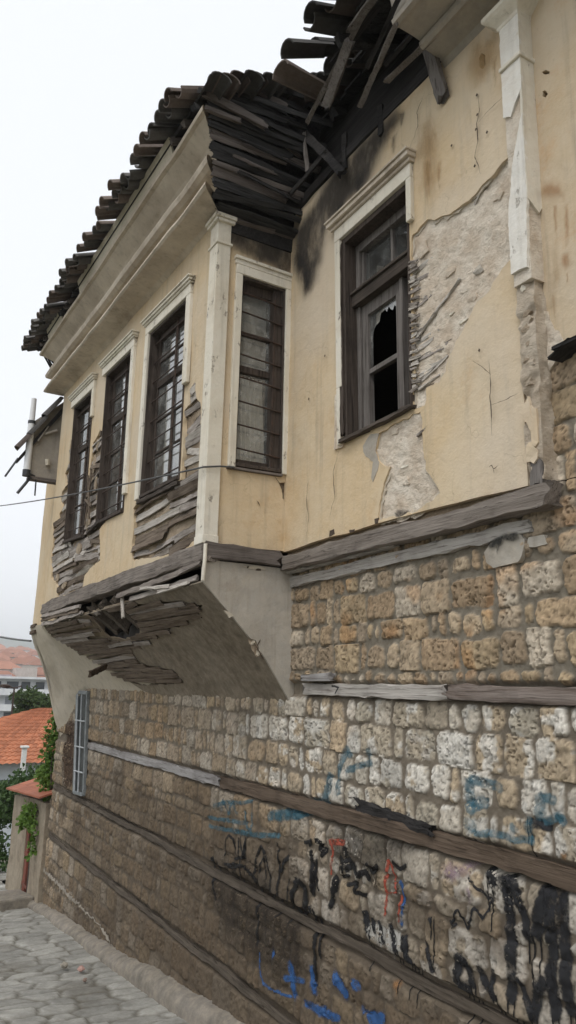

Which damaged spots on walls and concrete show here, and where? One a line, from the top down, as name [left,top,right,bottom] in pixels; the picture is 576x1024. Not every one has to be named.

crack [475,99,497,167]
damp [324,139,416,234]
spalling [374,160,510,525]
crack [478,364,516,432]
spalling [516,280,565,484]